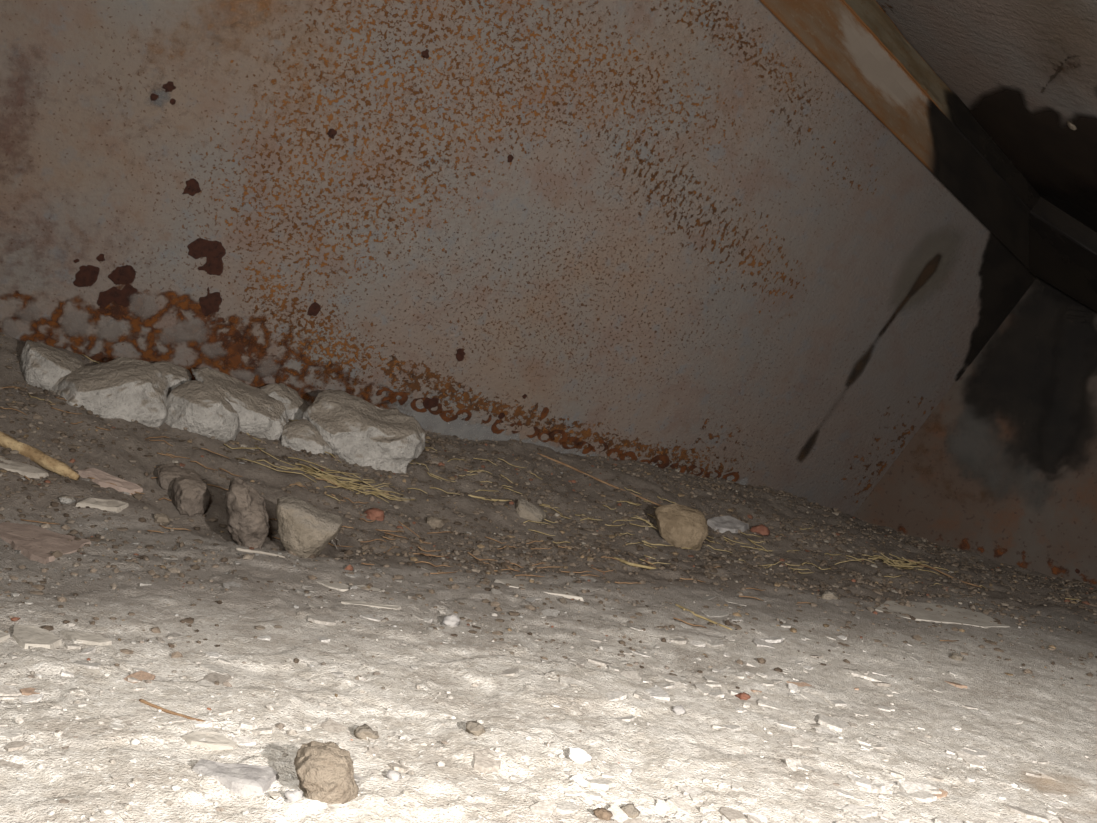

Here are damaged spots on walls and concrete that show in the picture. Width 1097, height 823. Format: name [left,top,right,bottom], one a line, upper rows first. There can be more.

rust [73,254,138,320]
damp [879,237,955,335]
damp [928,87,1097,501]
damp [846,346,873,386]
damp [798,431,818,461]